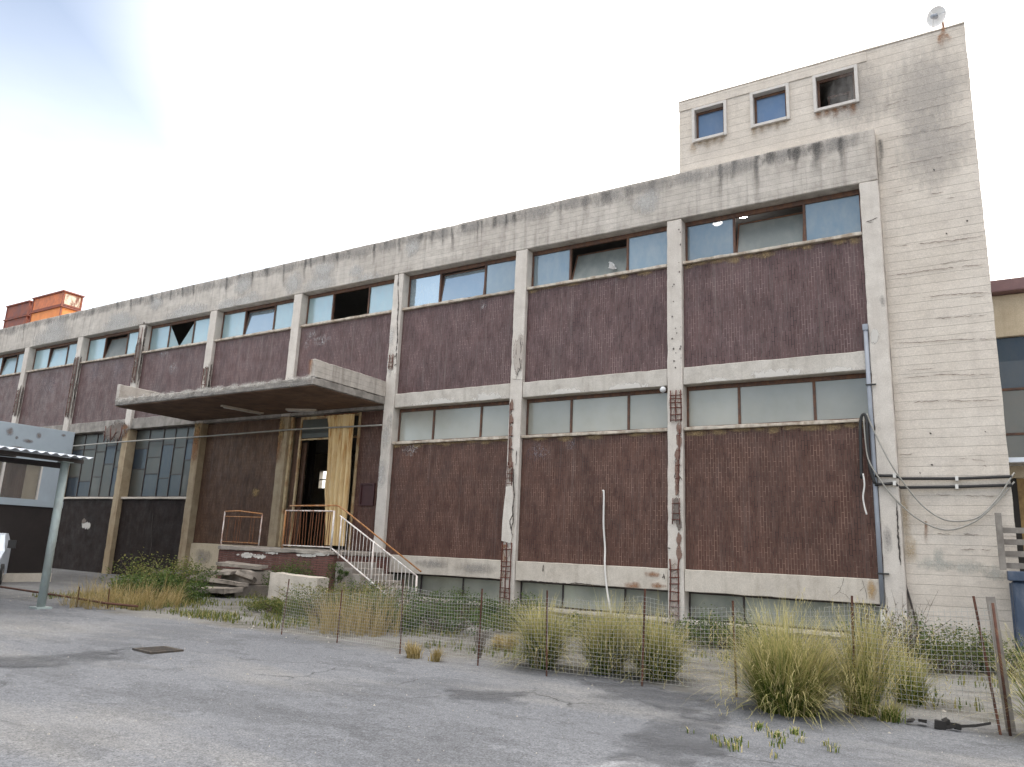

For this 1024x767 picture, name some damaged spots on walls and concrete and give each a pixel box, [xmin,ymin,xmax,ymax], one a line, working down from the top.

water stain [719,147,799,178]
water stain [813,137,854,158]